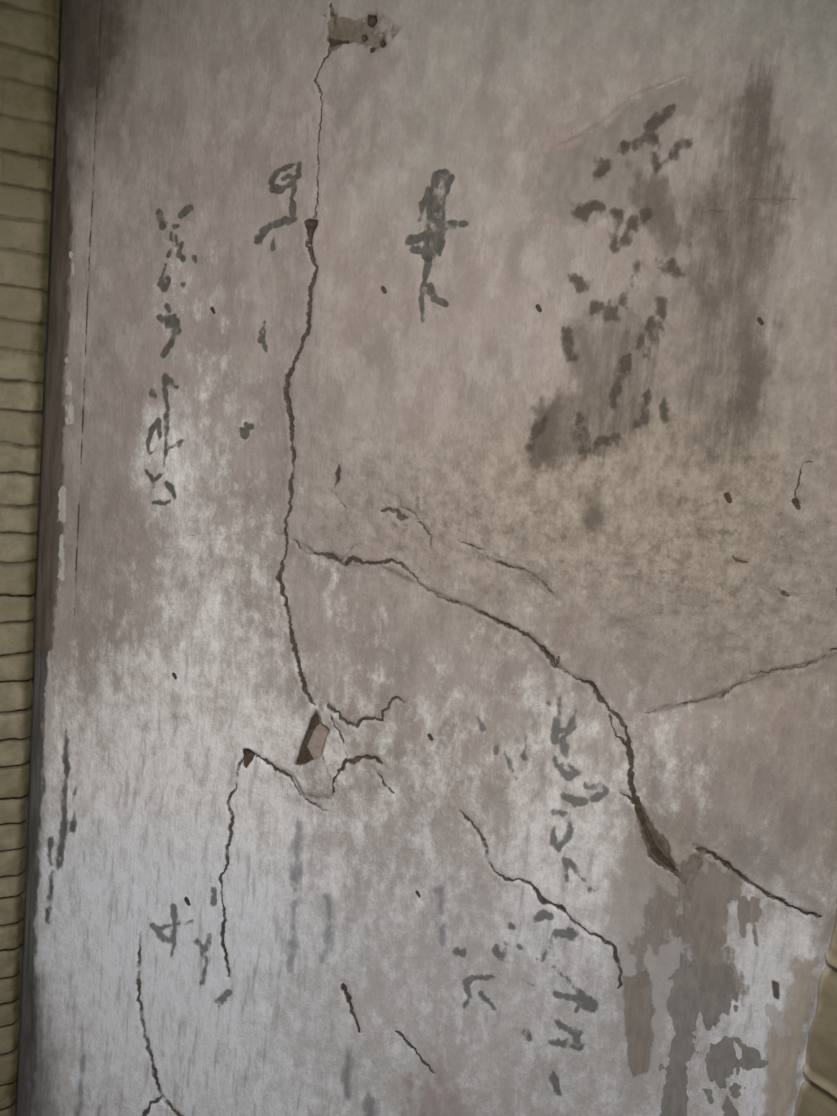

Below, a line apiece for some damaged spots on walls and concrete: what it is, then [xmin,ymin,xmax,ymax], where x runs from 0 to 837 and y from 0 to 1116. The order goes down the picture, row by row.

flaking render [323,14,395,52]
crack [219,45,680,989]
flaking render [295,711,329,765]
crack [695,846,822,918]
peeling [623,795,768,1116]
crack [136,948,183,1116]
crack [341,983,361,1033]